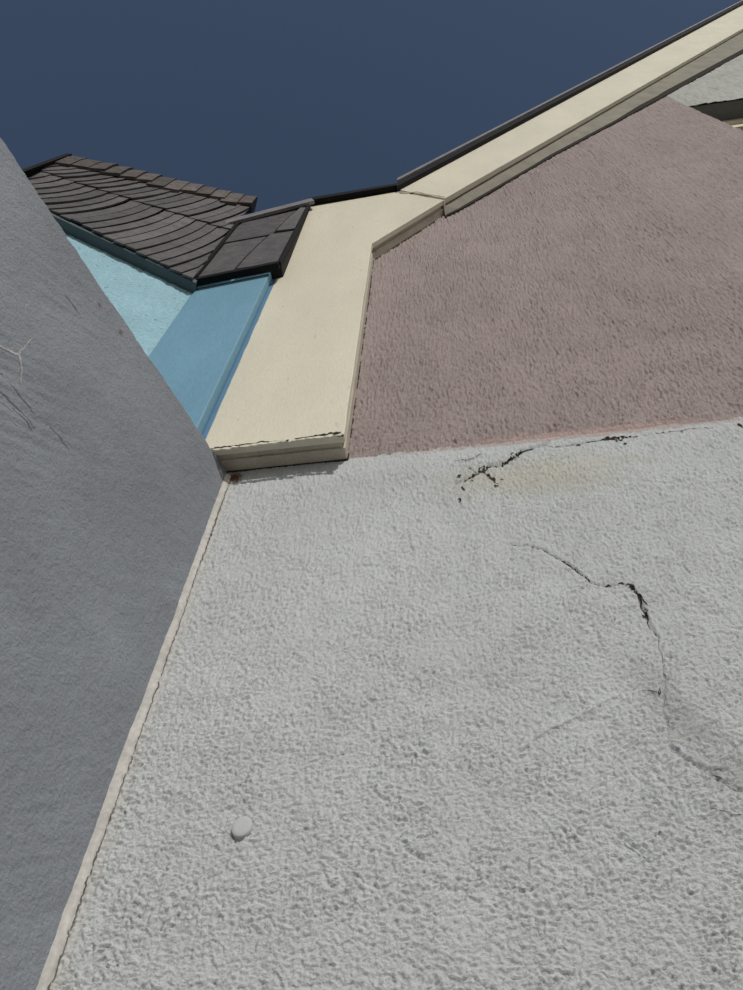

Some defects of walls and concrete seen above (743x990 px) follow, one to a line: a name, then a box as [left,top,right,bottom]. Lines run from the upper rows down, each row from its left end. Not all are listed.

crack [455,427,707,502]
crack [513,545,743,815]